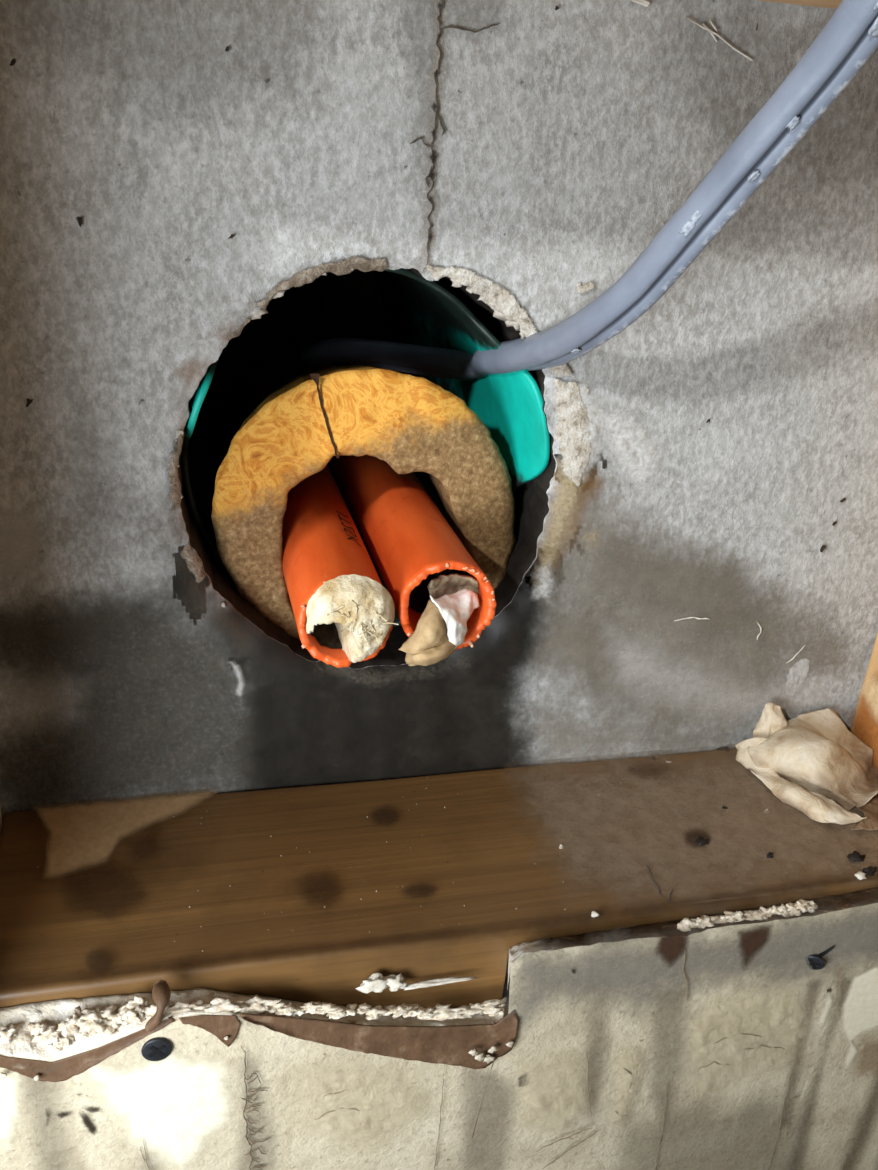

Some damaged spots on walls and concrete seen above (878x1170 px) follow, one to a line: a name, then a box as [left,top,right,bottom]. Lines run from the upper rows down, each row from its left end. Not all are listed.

crack [410,0,500,271]
flaking render [355,972,480,993]
damp [522,912,878,1013]
peeling [0,1075,17,1140]
damp [46,1108,99,1134]
damp [844,1086,878,1170]